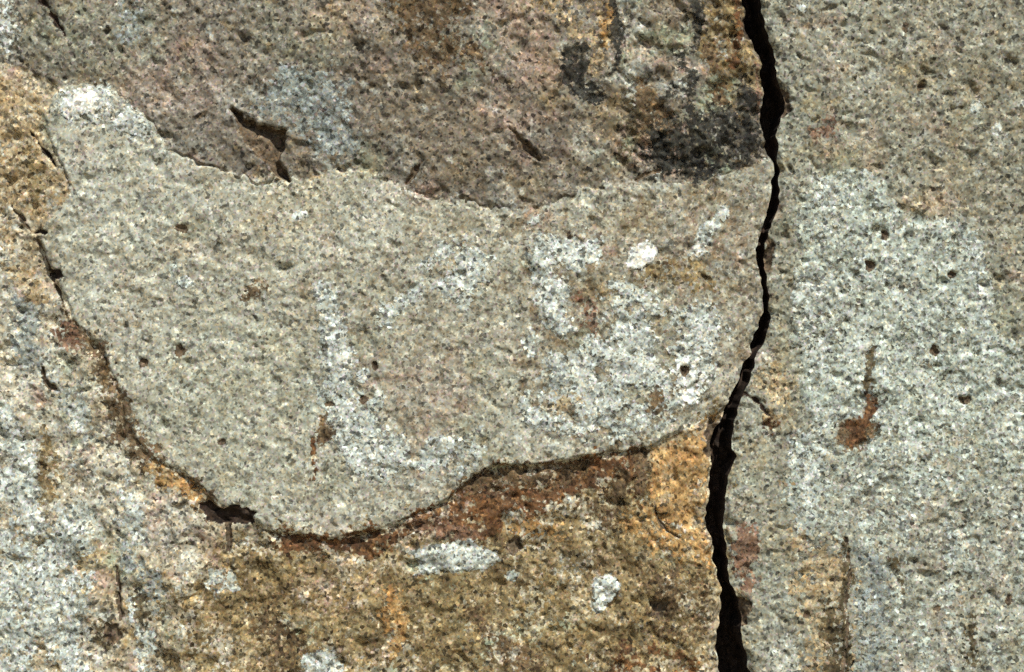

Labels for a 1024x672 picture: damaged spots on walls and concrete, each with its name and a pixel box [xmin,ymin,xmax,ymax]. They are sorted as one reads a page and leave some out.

damp [614,0,762,185]
crack [703,0,792,672]
corrosion [833,345,882,453]